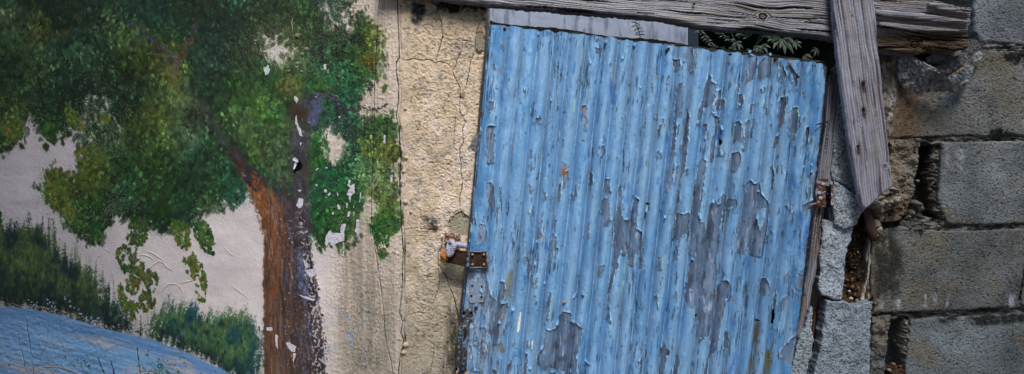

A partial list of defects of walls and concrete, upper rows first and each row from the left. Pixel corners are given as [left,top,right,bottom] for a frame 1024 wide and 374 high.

peeling [315,158,366,256]
crack [371,0,482,374]
peeling [469,26,541,163]
flaking render [465,47,874,374]